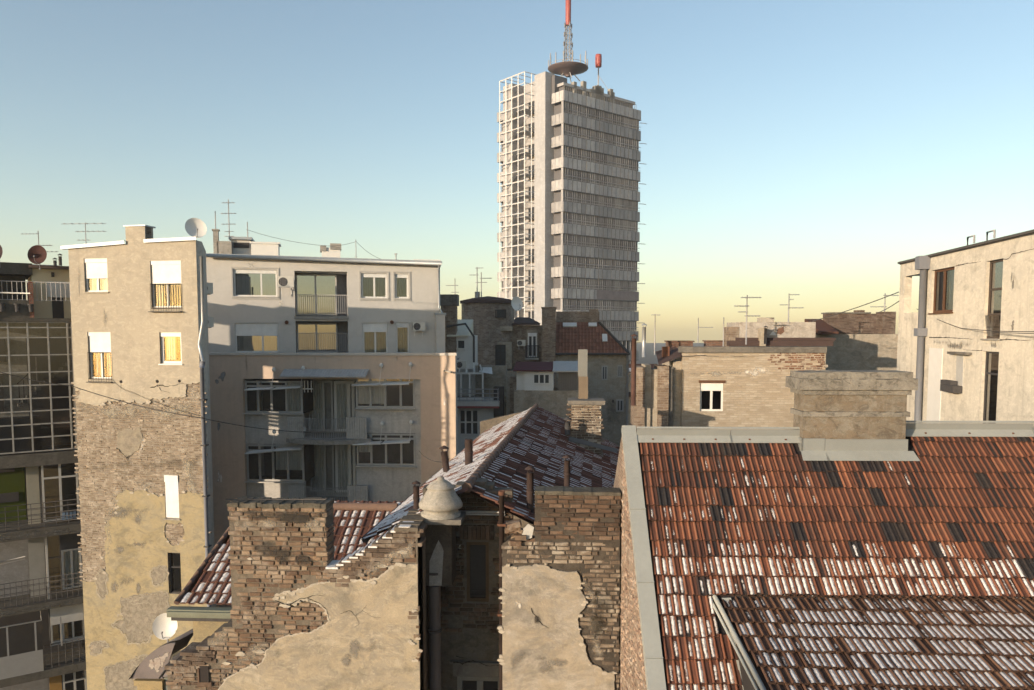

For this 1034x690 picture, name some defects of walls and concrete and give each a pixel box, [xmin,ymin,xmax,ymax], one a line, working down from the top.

flaking render [71,382,416,690]
flaking render [407,606,423,662]
flaking render [497,519,621,688]